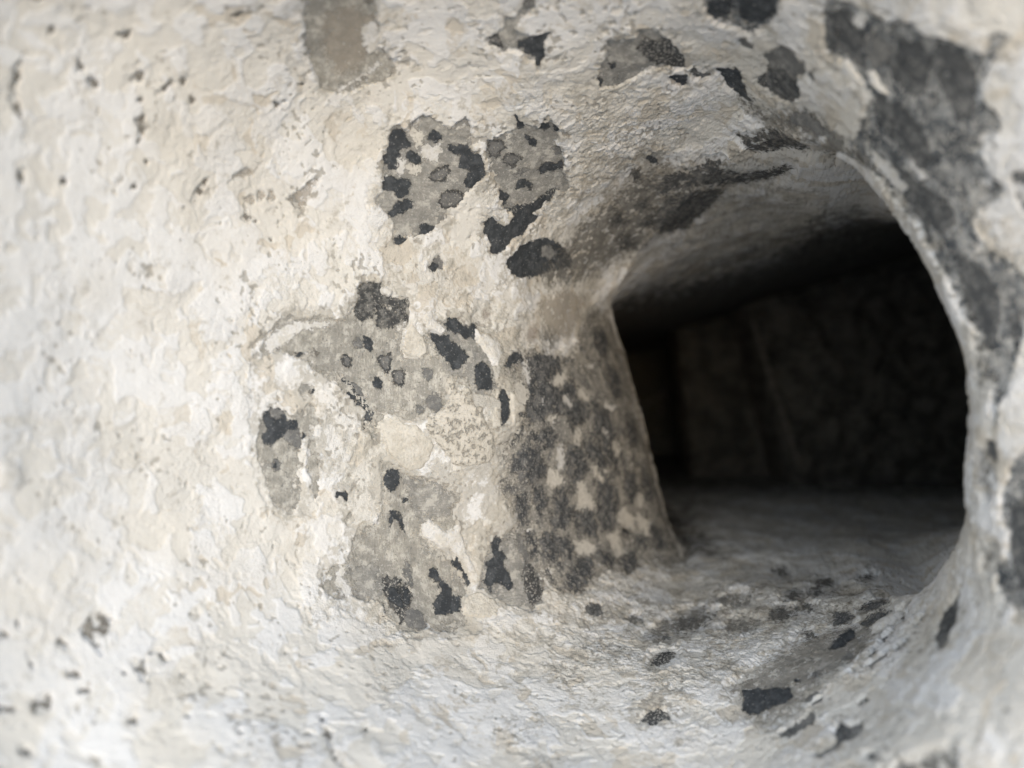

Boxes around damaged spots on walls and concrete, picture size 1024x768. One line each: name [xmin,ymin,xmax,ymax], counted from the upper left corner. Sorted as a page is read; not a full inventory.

peeling [302,0,396,93]
peeling [256,281,692,633]
damp [645,565,839,667]
damp [833,598,904,634]